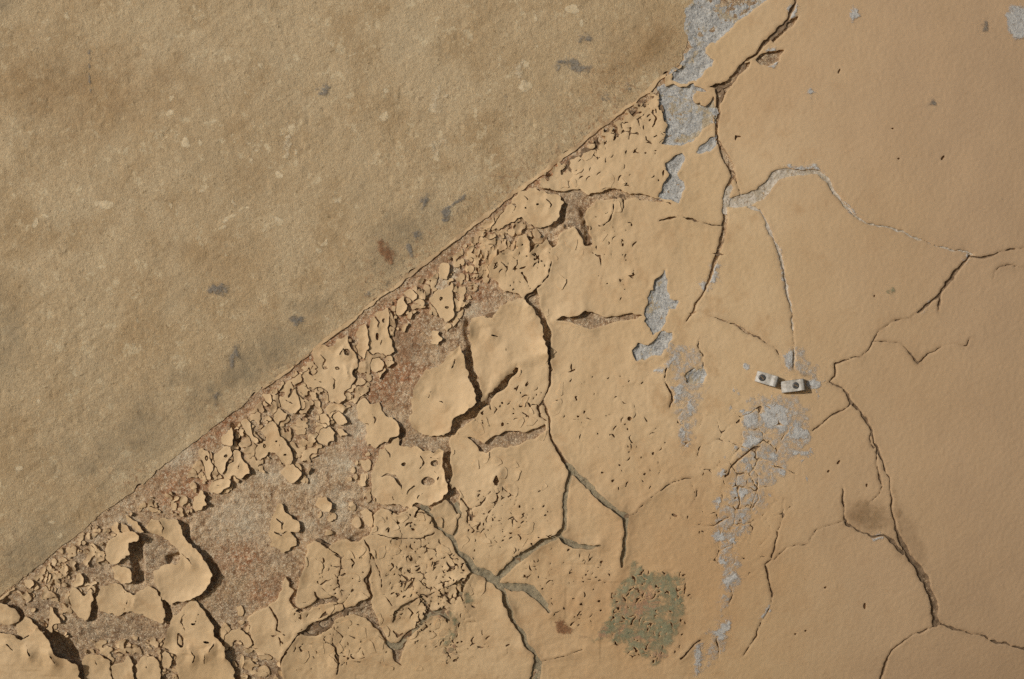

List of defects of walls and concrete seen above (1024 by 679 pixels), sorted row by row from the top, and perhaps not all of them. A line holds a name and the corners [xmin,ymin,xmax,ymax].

flaking render [0,0,767,679]
mould [584,563,684,665]
crack [267,0,1024,679]